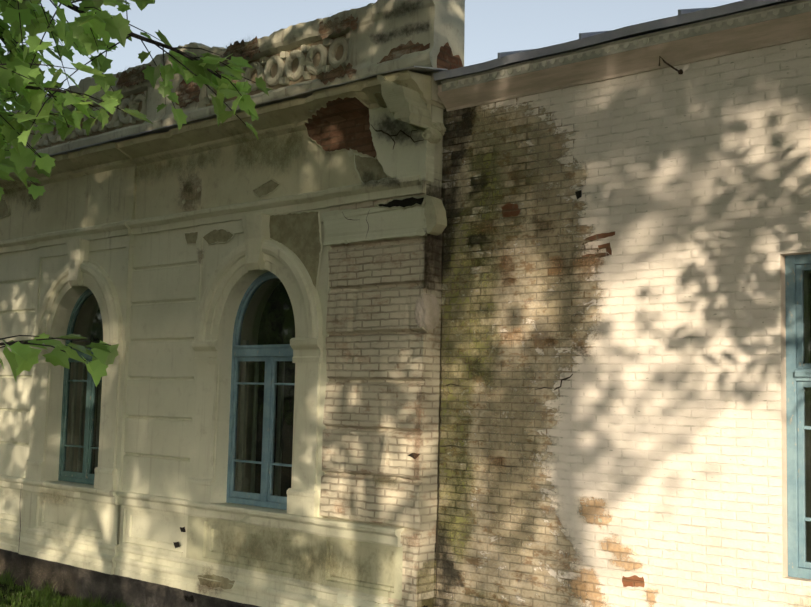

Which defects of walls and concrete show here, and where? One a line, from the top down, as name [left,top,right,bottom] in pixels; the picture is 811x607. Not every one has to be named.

flaking render [224,36,261,59]
flaking render [377,40,430,64]
flaking render [437,42,463,70]
flaking render [116,65,151,89]
flaking render [171,79,200,108]
crack [371,125,423,149]
damp [422,106,476,291]
damp [468,145,502,246]
peeling [269,91,616,607]
crack [535,374,573,390]
damp [417,462,474,607]
spalling [622,574,646,598]